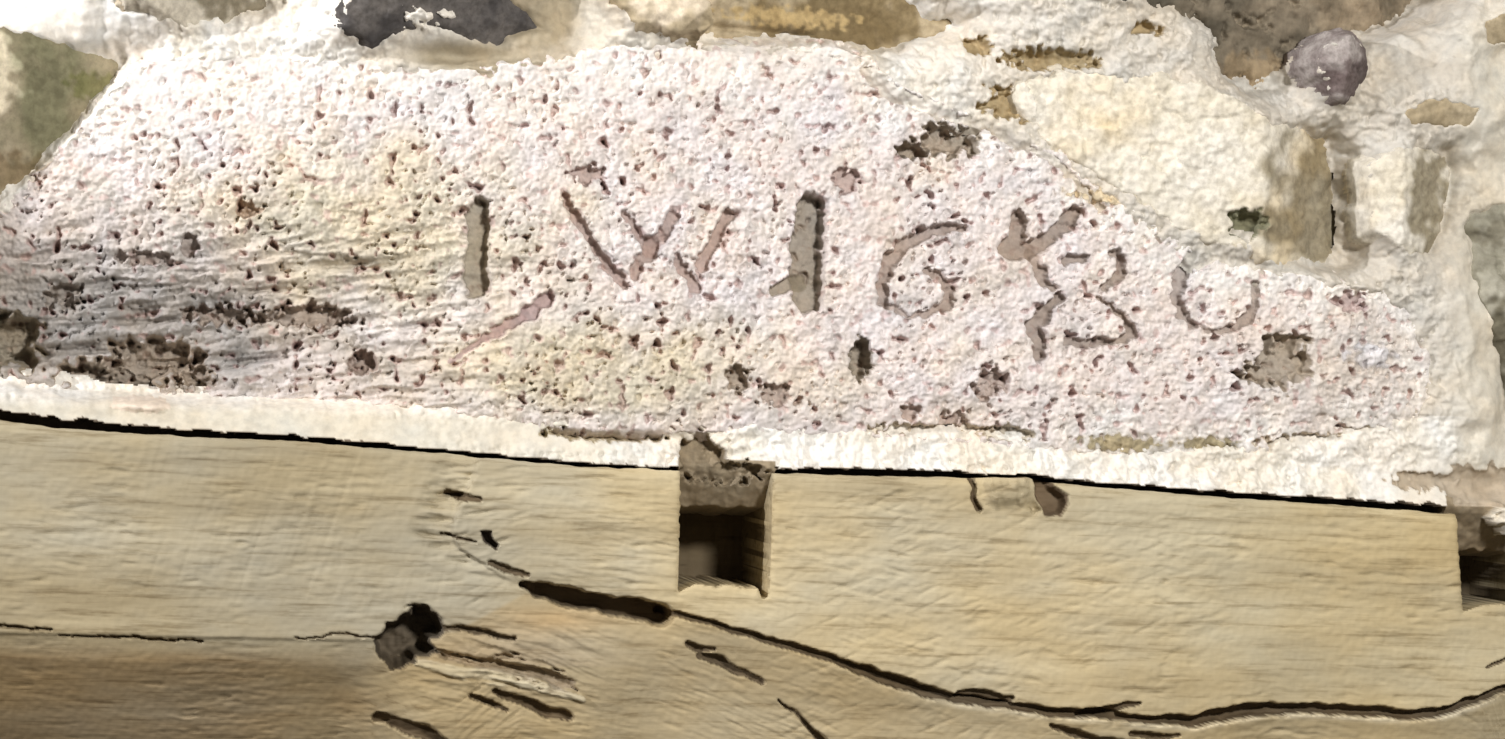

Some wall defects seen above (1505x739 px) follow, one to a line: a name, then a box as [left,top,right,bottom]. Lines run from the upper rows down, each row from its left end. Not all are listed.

crack [0,409,1505,739]